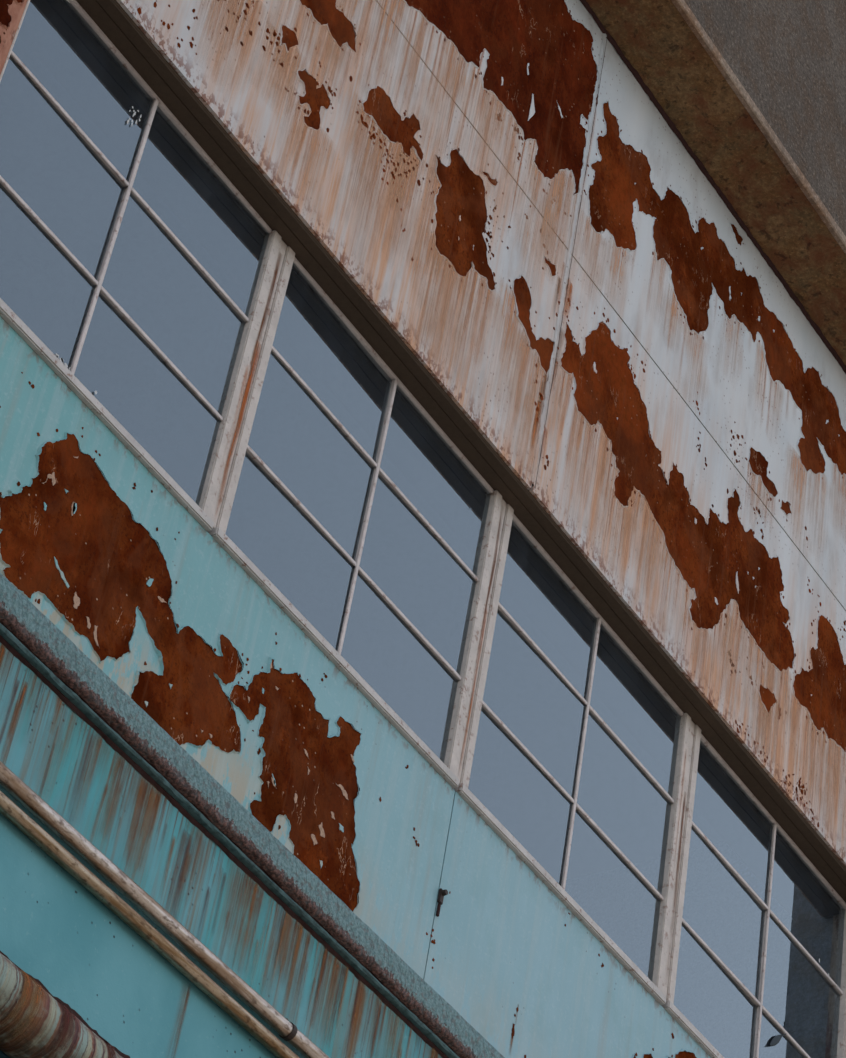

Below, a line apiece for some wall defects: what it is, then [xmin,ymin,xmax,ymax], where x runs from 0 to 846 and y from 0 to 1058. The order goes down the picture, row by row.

corrosion [161,9,198,55]
corrosion [213,0,372,179]
corrosion [224,264,279,477]
corrosion [0,427,362,912]
corrosion [781,769,819,827]
corrosion [276,909,347,1003]
corrosion [351,983,412,1054]